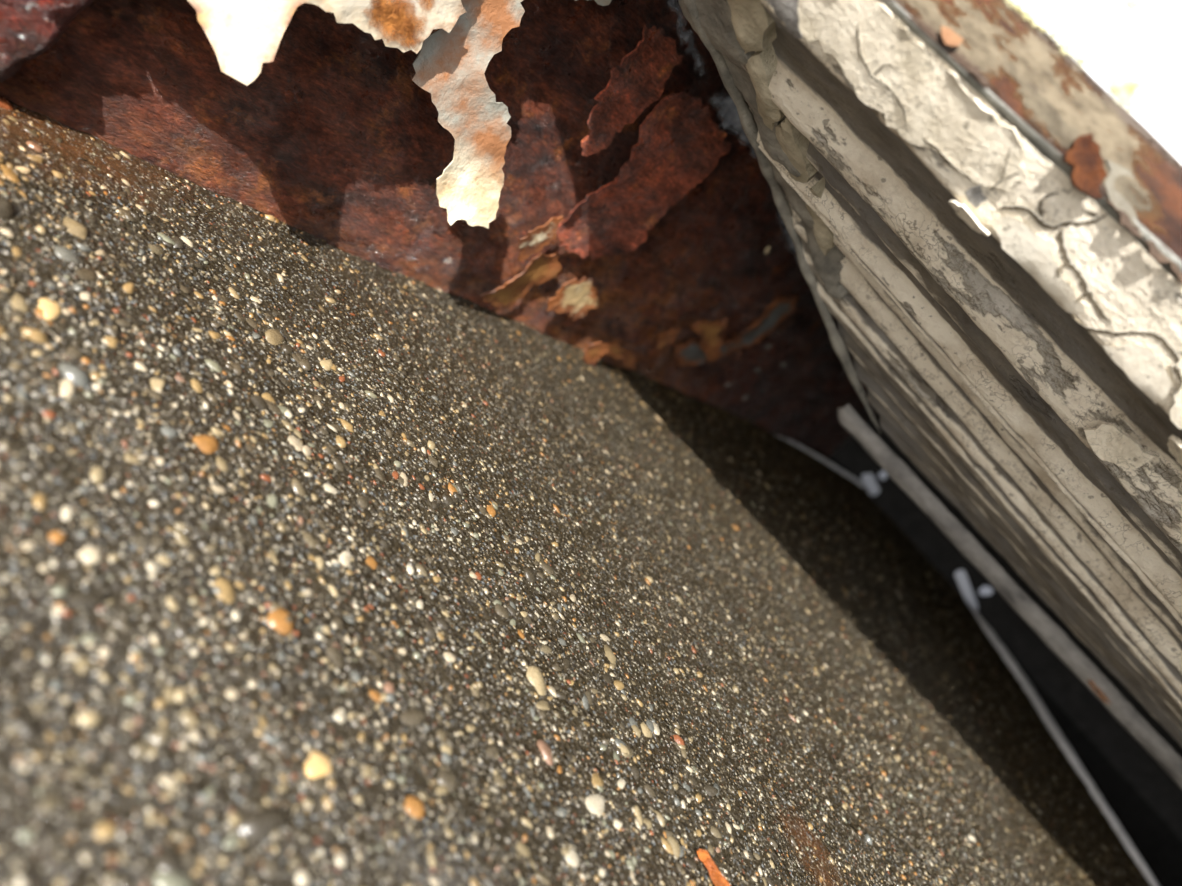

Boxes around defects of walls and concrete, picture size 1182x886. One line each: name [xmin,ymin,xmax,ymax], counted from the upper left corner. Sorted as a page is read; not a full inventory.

corrosion [371,0,419,45]
peeling [188,0,525,229]
corrosion [481,25,732,321]
peeling [764,0,1028,208]
crack [856,24,1182,401]
peeling [990,216,1085,314]
corrosion [1063,133,1108,199]
peeling [1104,160,1182,284]
corrosion [583,341,636,369]
corrosion [656,318,728,364]
spalling [671,293,798,367]
peeling [1084,343,1182,470]